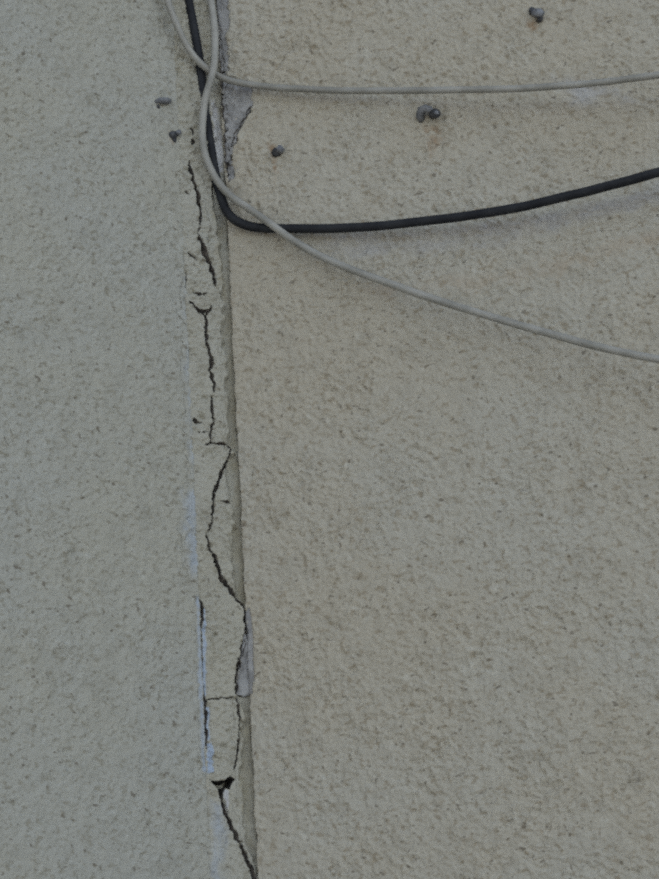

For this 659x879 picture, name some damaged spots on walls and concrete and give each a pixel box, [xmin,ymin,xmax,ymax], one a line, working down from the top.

spalling [209,0,254,184]
crack [185,127,247,770]
peeling [194,595,235,879]
crack [211,780,257,879]